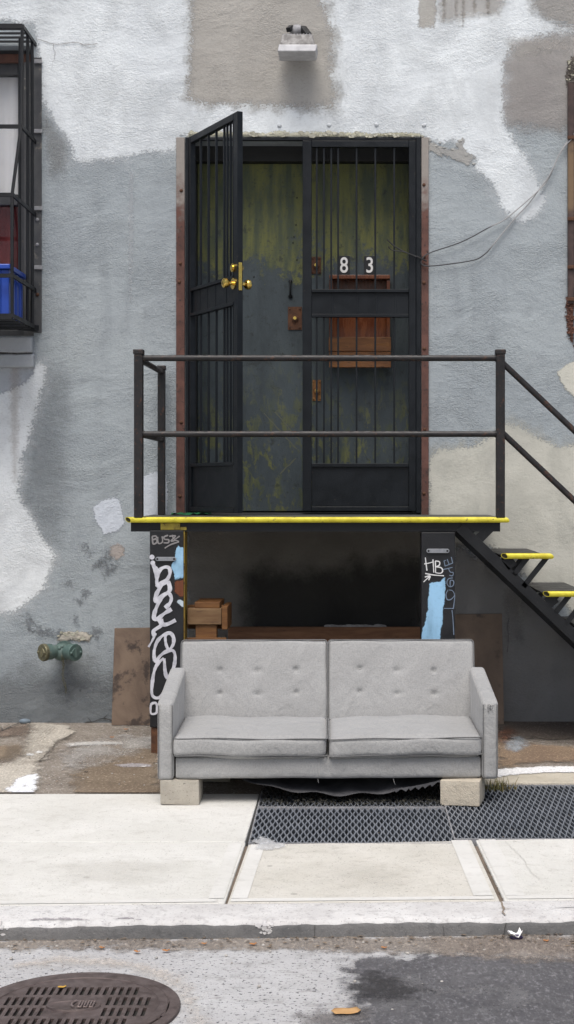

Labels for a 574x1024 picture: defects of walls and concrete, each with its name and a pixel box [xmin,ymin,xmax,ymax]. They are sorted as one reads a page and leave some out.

spalling [243,130,476,166]